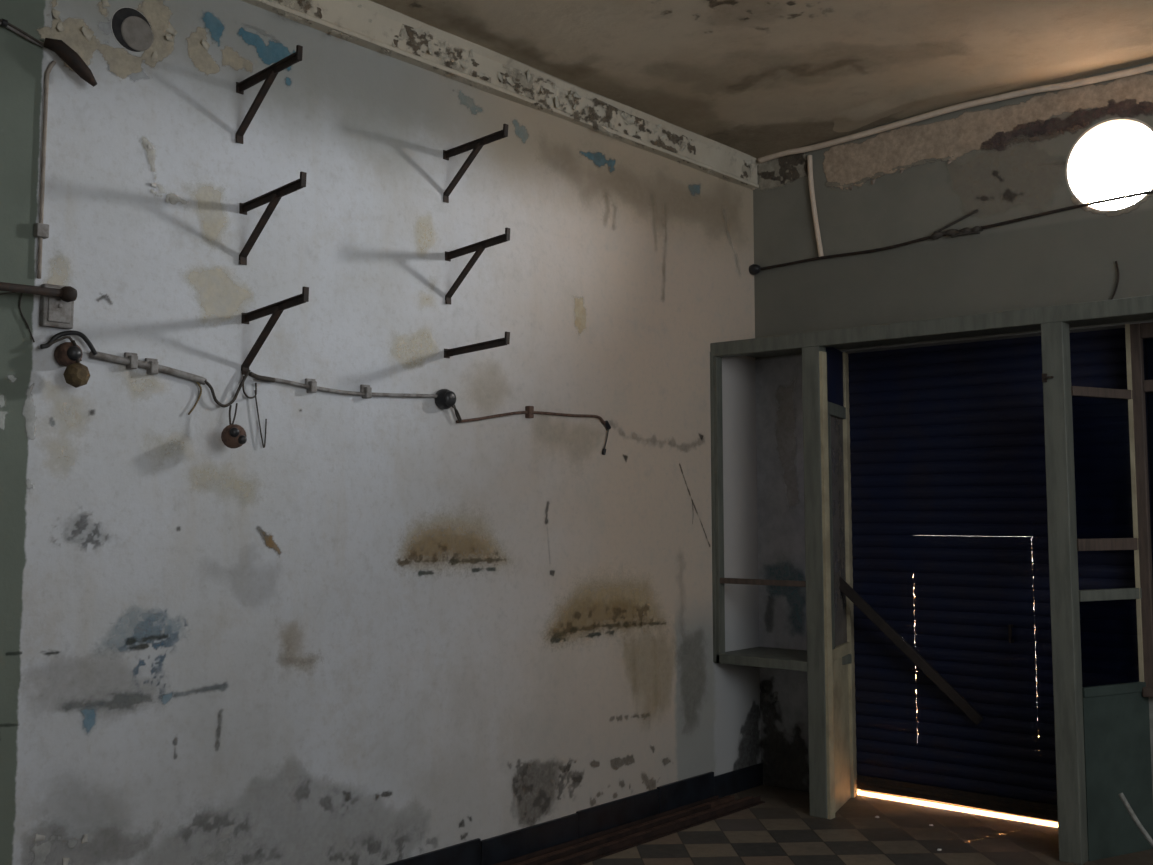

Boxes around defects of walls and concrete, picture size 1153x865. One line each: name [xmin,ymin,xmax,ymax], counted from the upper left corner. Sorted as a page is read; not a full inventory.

peeling [37,0,295,86]
peeling [268,0,322,24]
peeling [382,25,701,168]
peeling [580,151,615,172]
peeling [23,384,36,439]
damp [65,615,186,732]
damp [733,680,809,792]
damp [514,762,580,826]